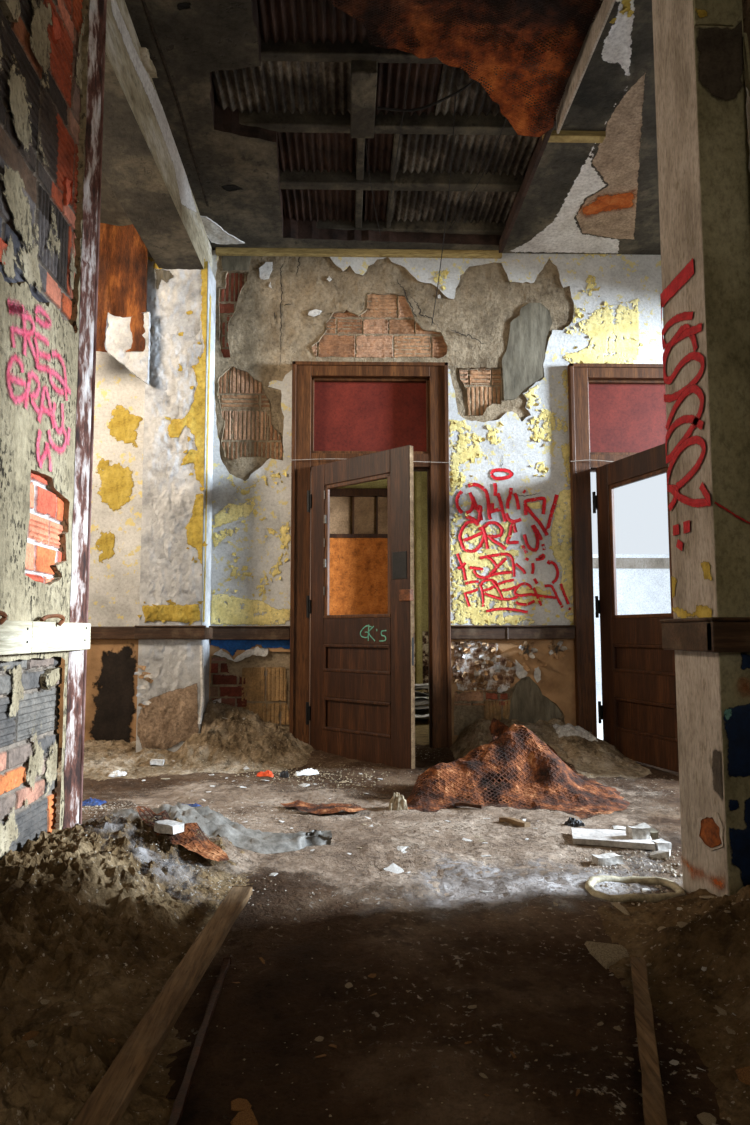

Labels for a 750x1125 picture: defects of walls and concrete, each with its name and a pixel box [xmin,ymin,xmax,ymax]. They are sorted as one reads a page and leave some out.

flaking render [694,0,750,171]
flaking render [0,0,89,334]
flaking render [107,0,646,626]
flaking render [25,469,70,585]
peeling [95,529,115,563]
peeling [95,458,134,511]
flaking render [134,640,290,750]
peeling [414,631,429,693]
flaking render [451,640,567,735]
flaking render [0,656,62,861]
peeling [696,653,750,913]